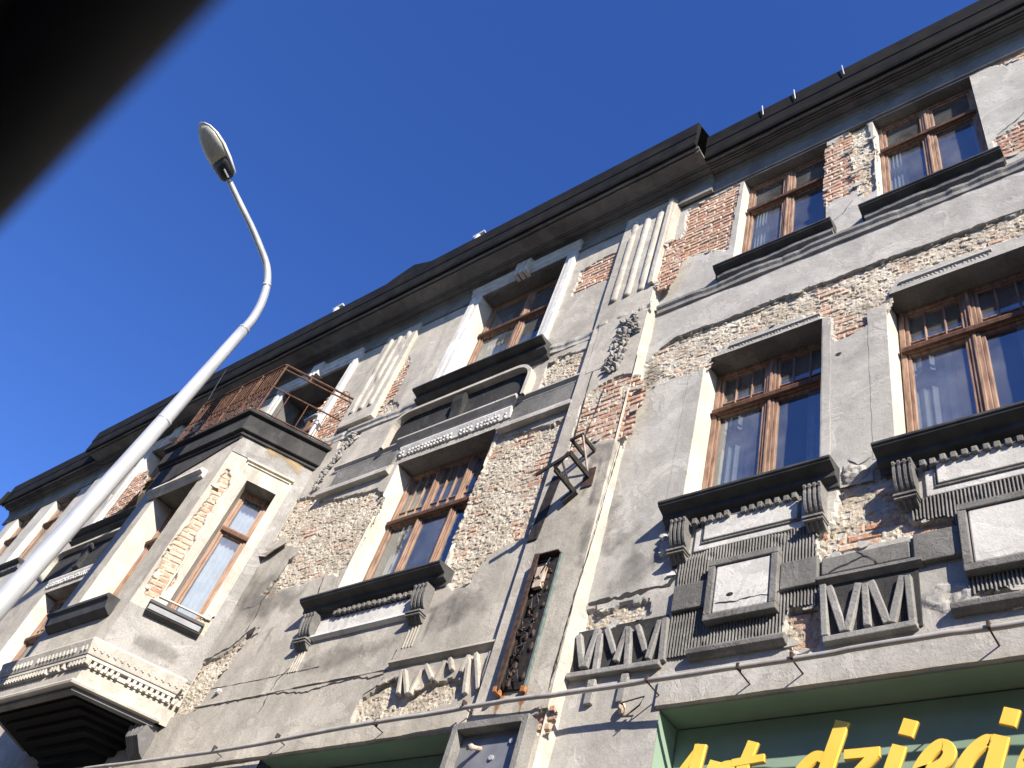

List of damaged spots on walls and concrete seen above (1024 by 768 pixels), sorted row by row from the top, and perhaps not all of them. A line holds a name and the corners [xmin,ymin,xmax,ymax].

flaking render [822,125,880,208]
flaking render [994,123,1024,159]
flaking render [652,186,740,291]
flaking render [568,214,1024,458]
flaking render [145,470,230,599]
flaking render [259,491,386,596]
flaking render [450,423,563,588]
flaking render [819,469,954,563]
crack [203,560,290,662]
flaking render [174,628,260,716]
crack [199,649,397,714]
flaking render [355,675,463,722]